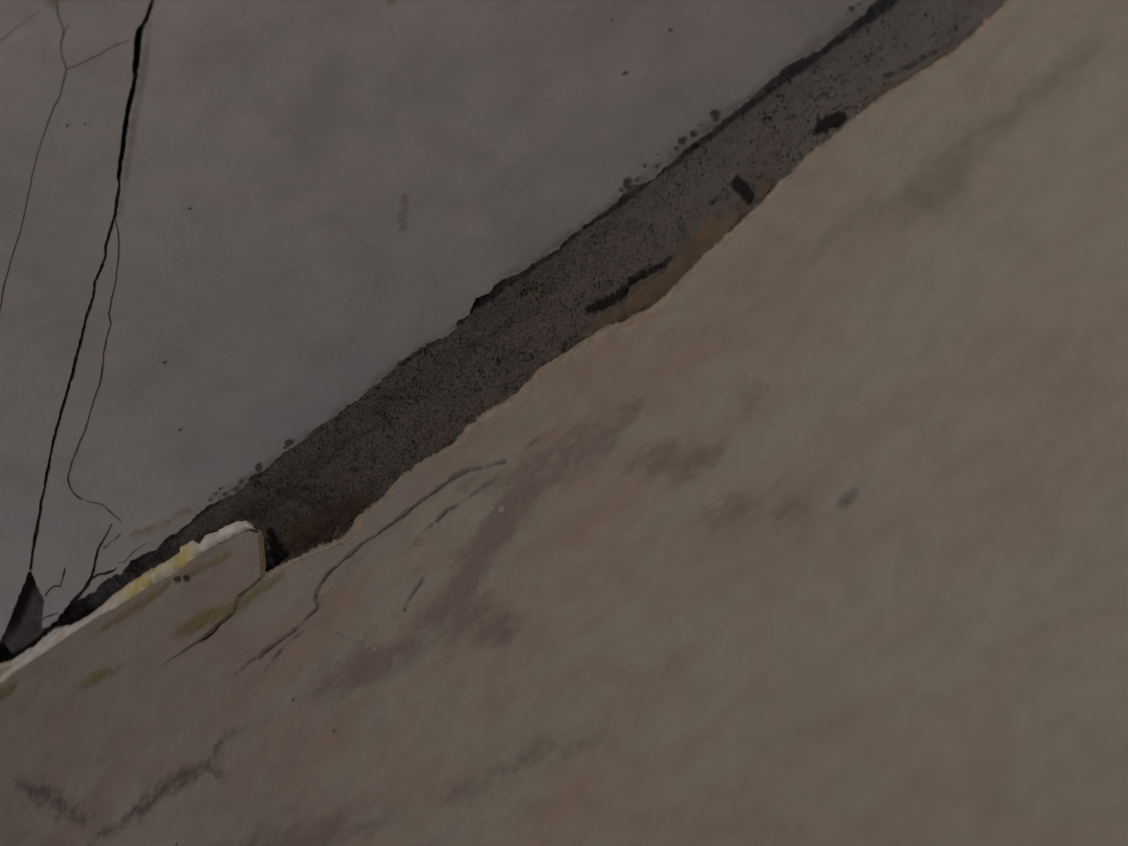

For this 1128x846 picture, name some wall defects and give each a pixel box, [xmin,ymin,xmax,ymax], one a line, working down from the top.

crack [0,0,154,620]
crack [197,602,238,644]
spalling [0,0,1006,683]